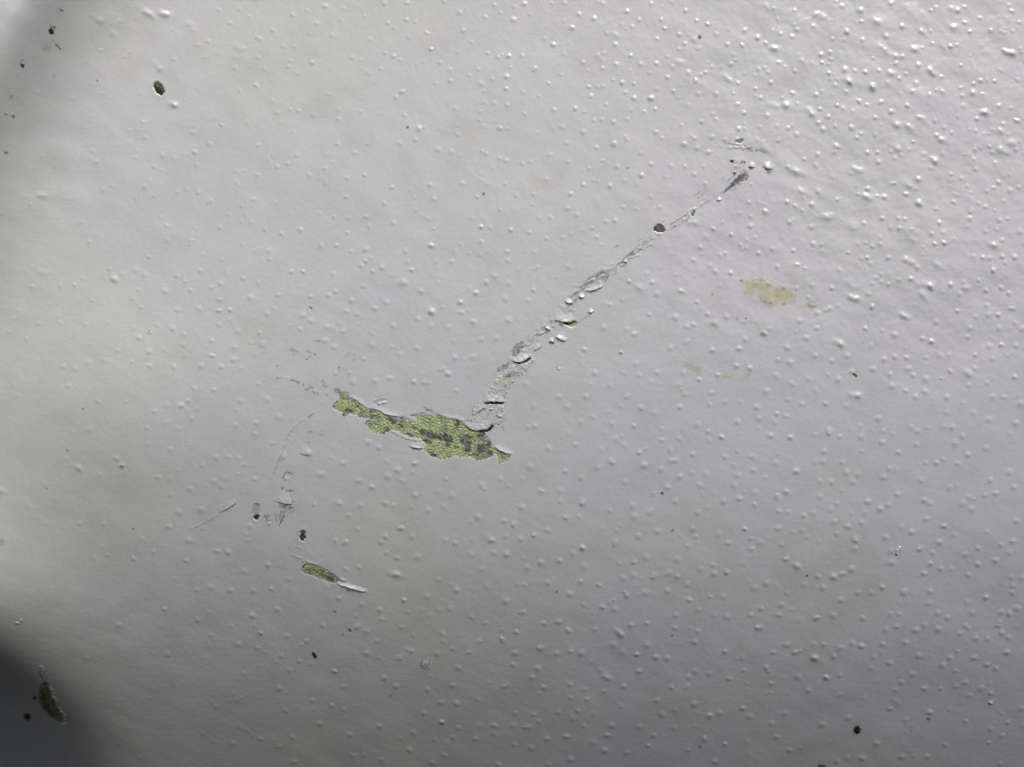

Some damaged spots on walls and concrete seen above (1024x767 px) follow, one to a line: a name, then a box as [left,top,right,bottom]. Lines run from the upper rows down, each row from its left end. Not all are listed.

peeling [653,224,667,236]
peeling [545,326,569,344]
peeling [333,389,514,464]
peeling [301,564,367,592]
peeling [38,664,72,729]